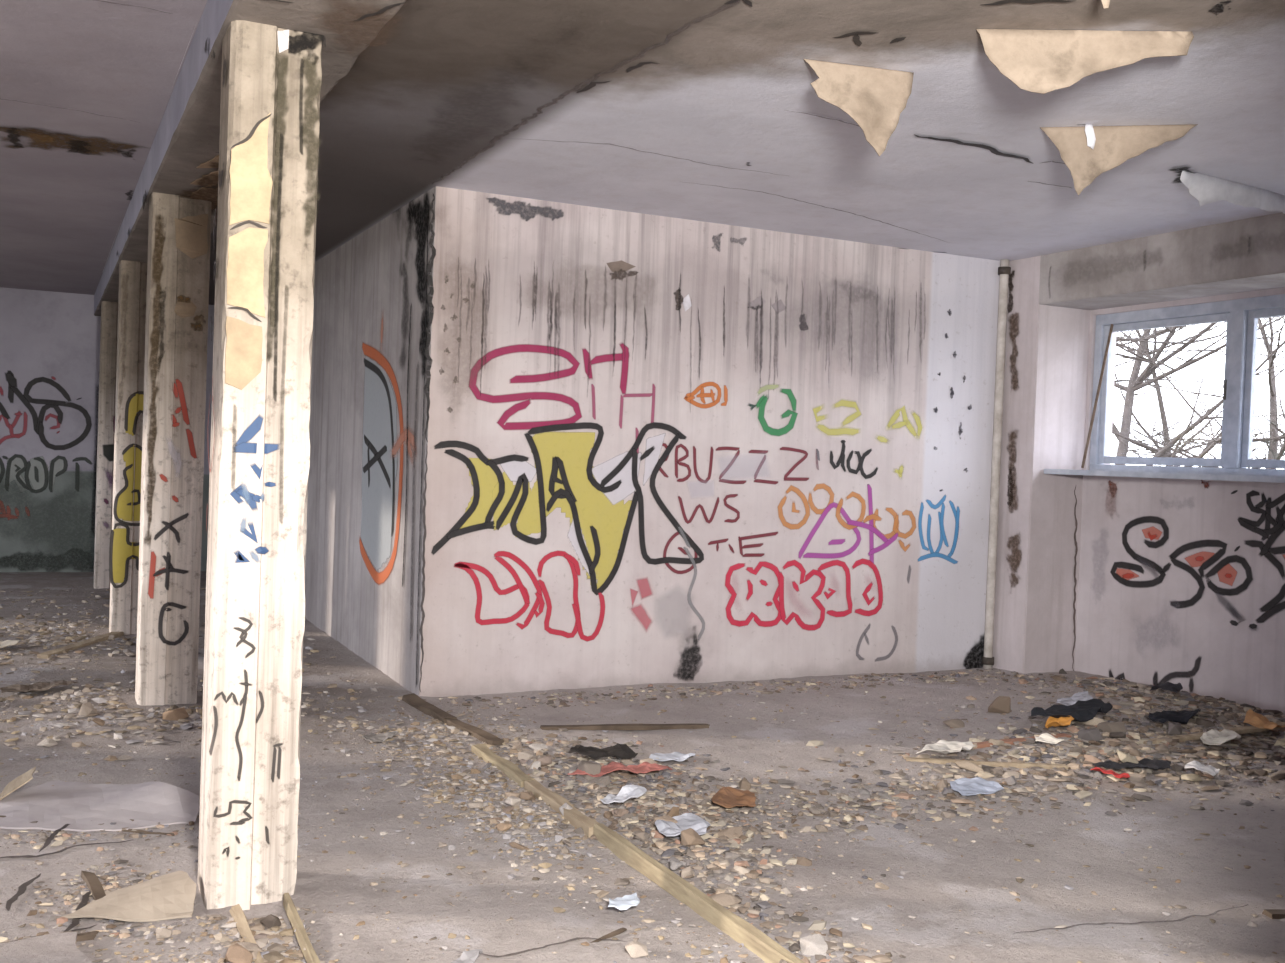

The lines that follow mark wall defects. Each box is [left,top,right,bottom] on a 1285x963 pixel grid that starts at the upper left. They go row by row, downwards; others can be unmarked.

spalling [1209,0,1231,15]
peeling [976,29,1194,94]
peeling [803,59,914,156]
peeling [1039,124,1198,196]
peeling [1169,167,1285,214]
crack [1071,487,1079,671]
crack [1013,904,1248,934]